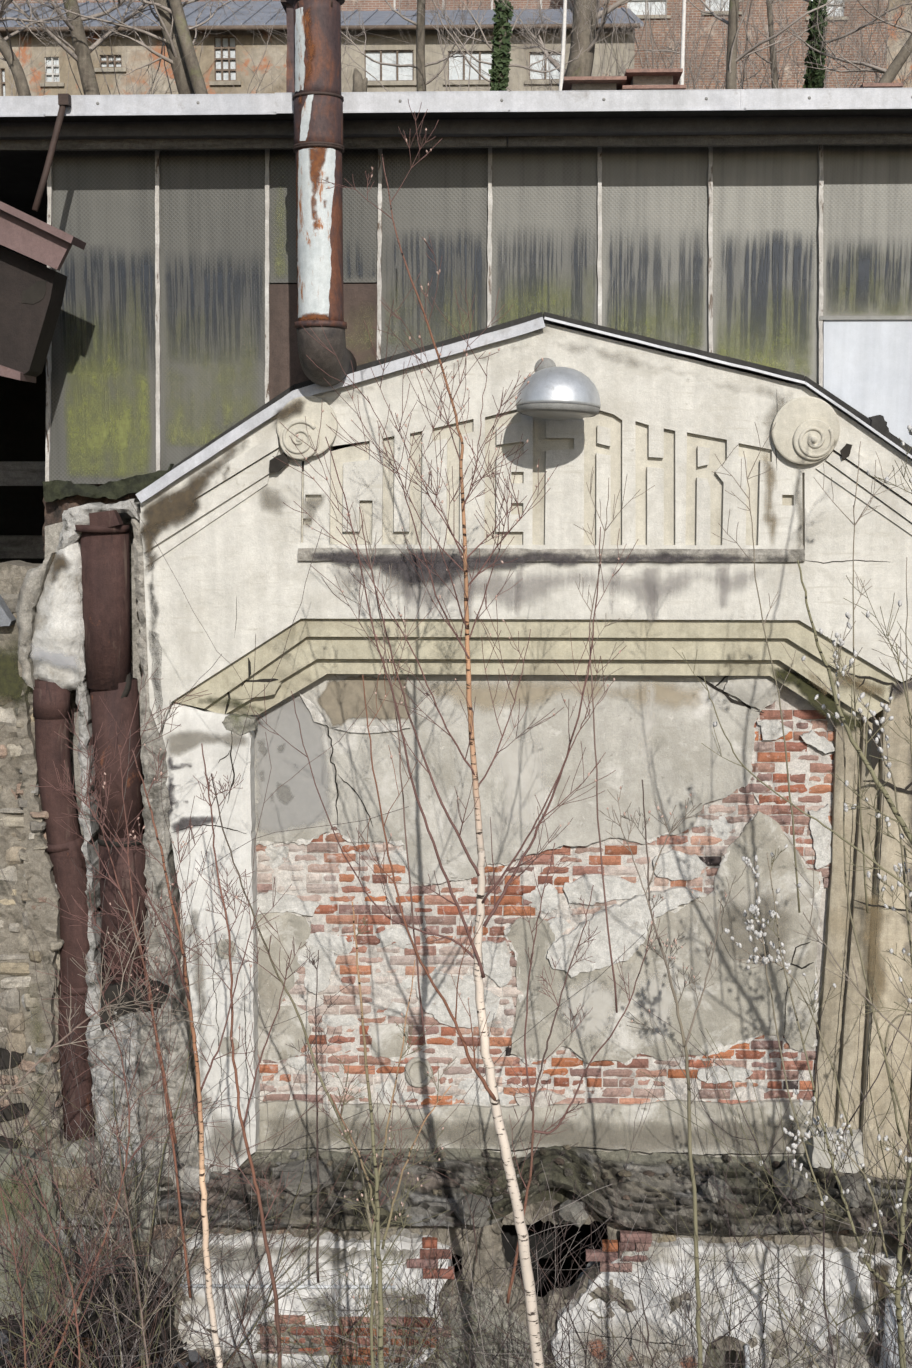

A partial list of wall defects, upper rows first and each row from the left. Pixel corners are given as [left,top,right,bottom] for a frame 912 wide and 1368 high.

corrosion [299,10,315,111]
corrosion [296,147,328,321]
water stain [505,241,703,326]
water stain [723,236,912,329]
water stain [314,551,750,583]
spalling [298,676,411,733]
crack [697,676,764,713]
spalling [256,701,835,1109]
crack [833,673,912,1131]
crack [484,1147,806,1156]
spalling [406,1237,462,1279]
spalling [501,1220,652,1297]